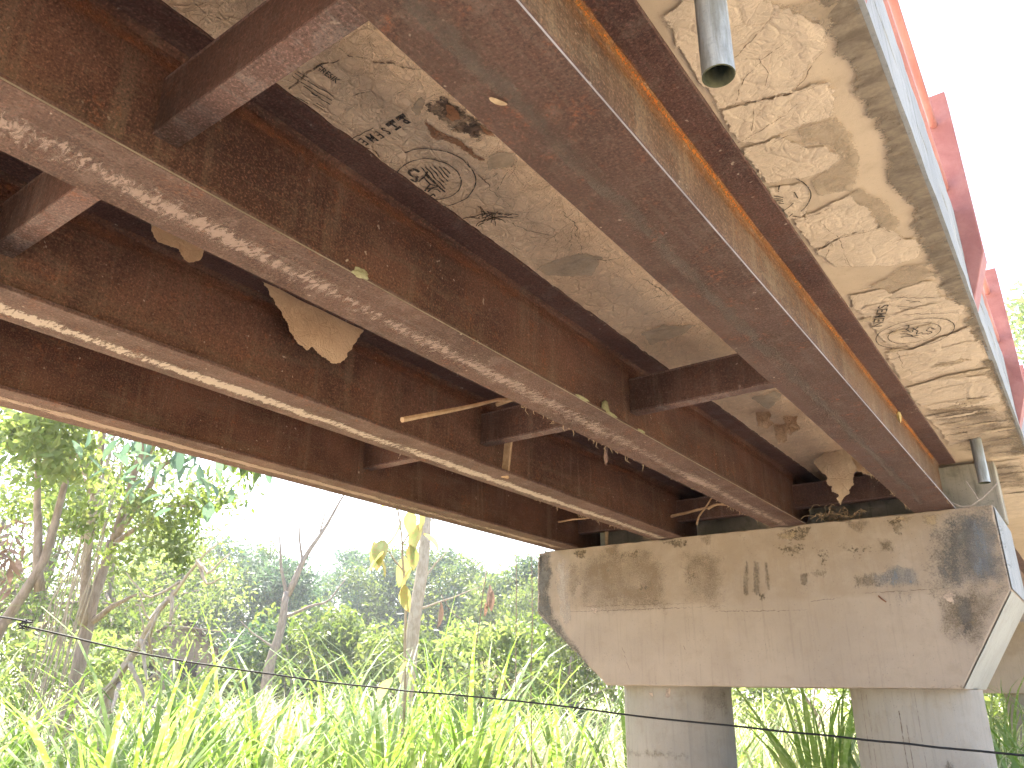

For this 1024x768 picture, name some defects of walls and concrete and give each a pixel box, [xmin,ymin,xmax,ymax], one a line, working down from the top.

peeling [0,111,787,549]
spalling [412,92,496,141]
corrosion [575,0,933,458]
damp [821,0,1024,494]
damp [931,507,1006,642]